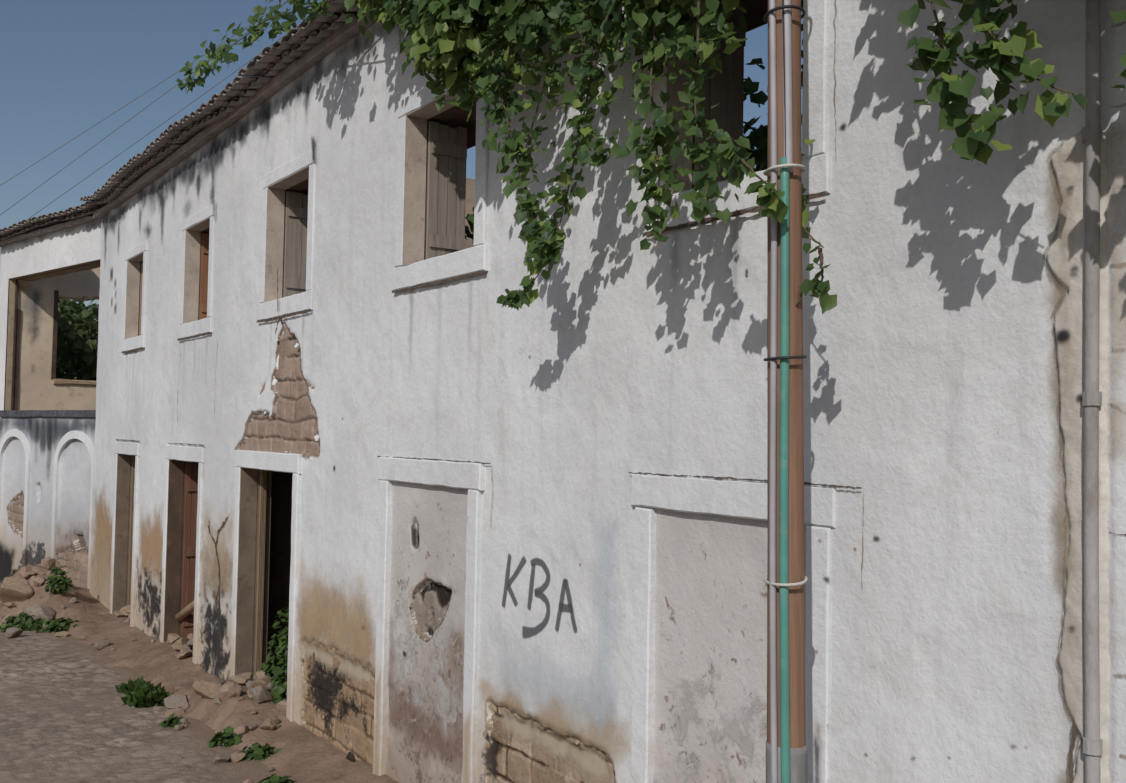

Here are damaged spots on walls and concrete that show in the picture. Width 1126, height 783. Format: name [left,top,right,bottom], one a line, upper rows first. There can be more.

water stain [138,61,322,233]
water stain [92,206,125,243]
flaking render [235,324,320,458]
flaking render [7,491,24,538]
water stain [137,568,162,639]
water stain [200,520,231,679]
crack [208,515,229,649]
flaking render [408,578,452,642]
flaking render [300,634,375,766]
flaking render [480,697,616,783]